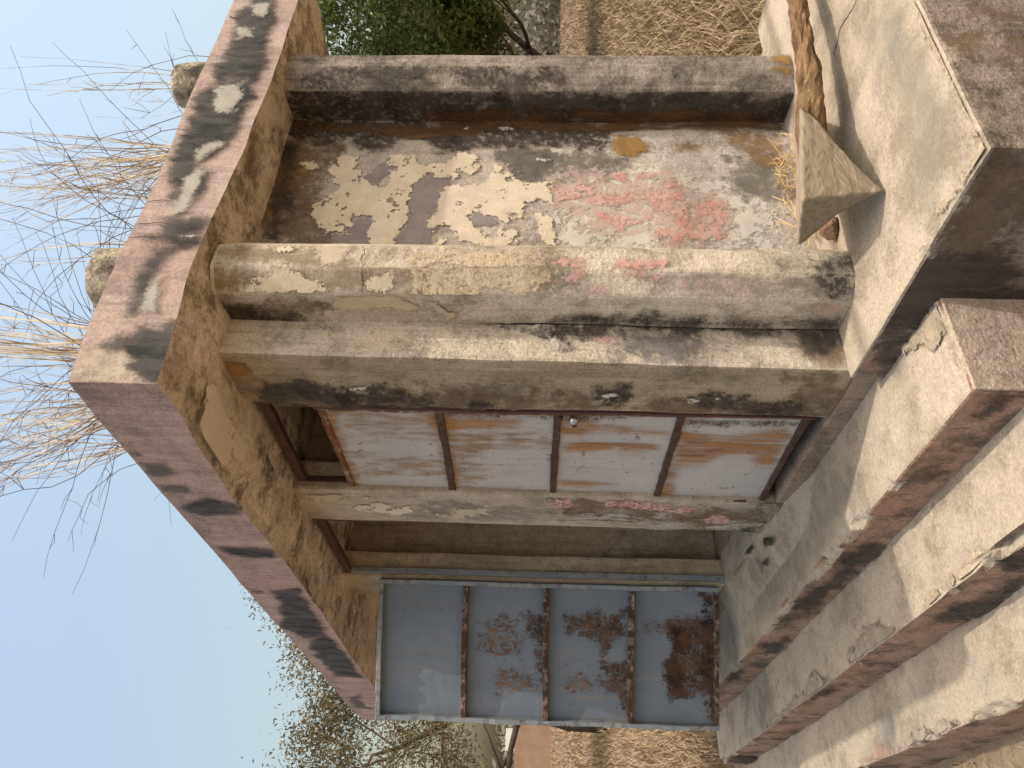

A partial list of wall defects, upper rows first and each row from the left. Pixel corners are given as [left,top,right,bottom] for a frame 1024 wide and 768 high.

leakage [168,0,276,199]
leakage [214,66,796,322]
peeling [300,143,783,295]
corrosion [611,134,651,158]
leakage [98,212,210,383]
peeling [246,267,328,293]
leakage [253,310,845,417]
crack [448,322,733,331]
peeling [900,306,947,357]
corrosion [327,411,661,488]
peeling [549,499,782,533]
corrosion [557,592,714,720]